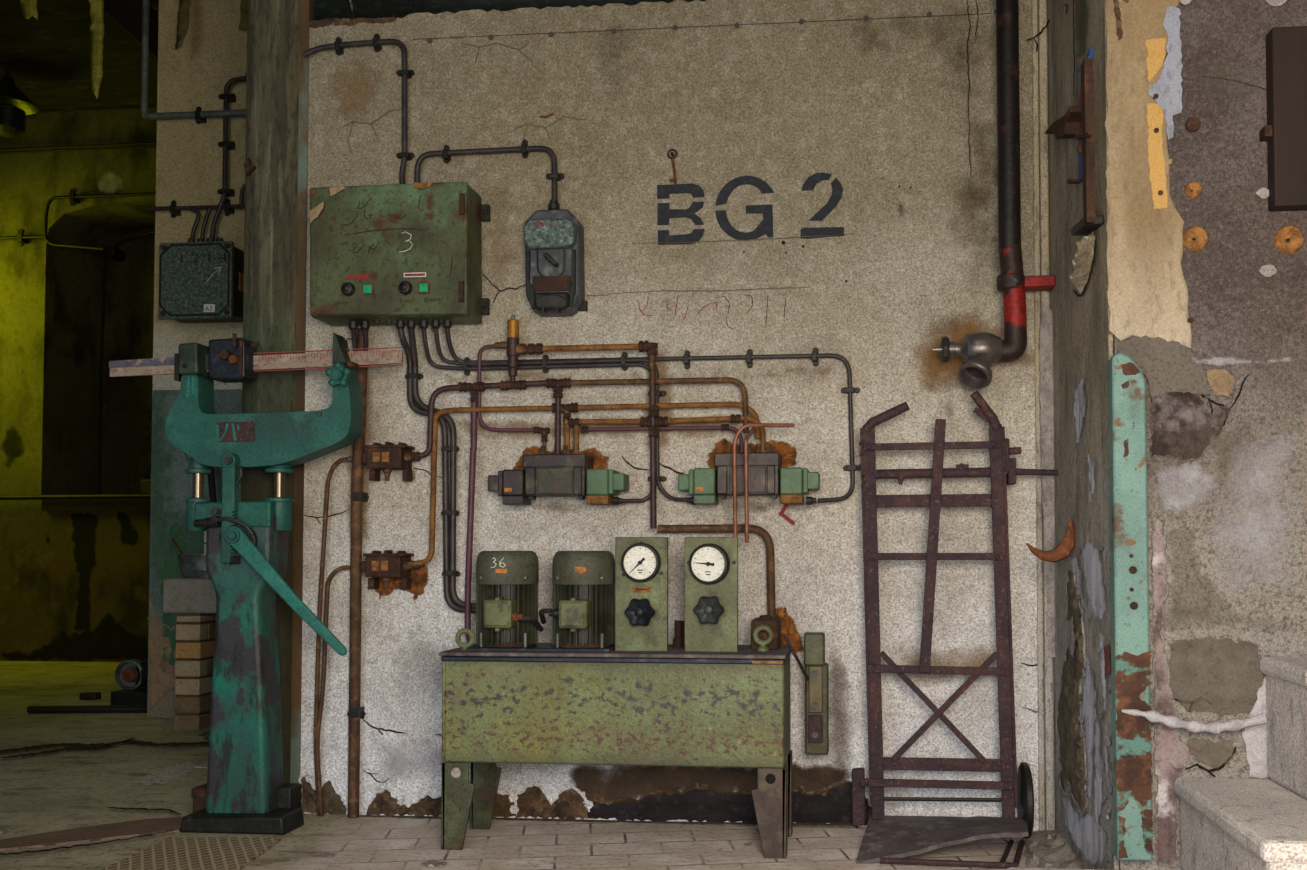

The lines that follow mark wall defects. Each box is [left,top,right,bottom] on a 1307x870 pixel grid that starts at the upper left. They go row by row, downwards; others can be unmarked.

crack [335,108,409,154]
peeling [1105,0,1236,463]
corrosion [923,320,983,388]
water stain [2,512,148,662]
spalling [1056,536,1113,870]
spalling [1150,512,1191,868]
crack [0,738,209,758]
spalling [298,772,348,815]
spalling [366,782,441,816]
spalling [492,782,757,823]
spalling [792,780,872,826]